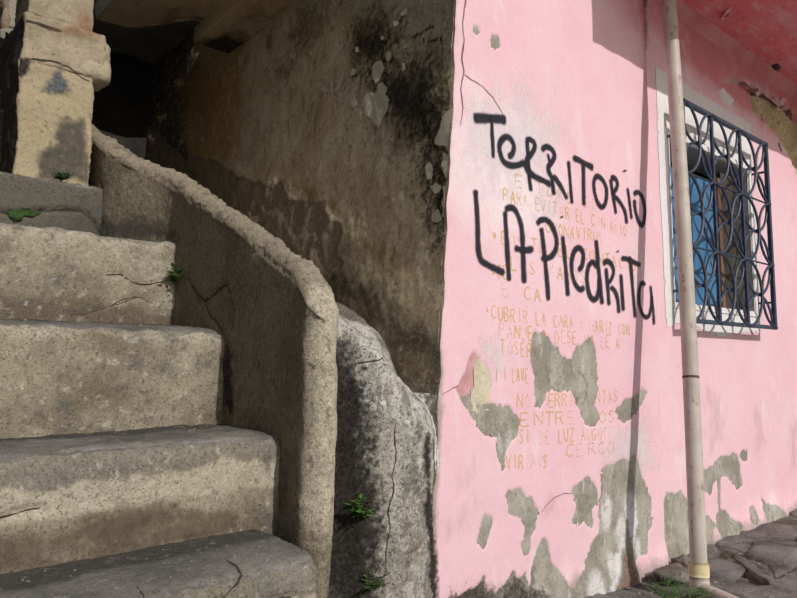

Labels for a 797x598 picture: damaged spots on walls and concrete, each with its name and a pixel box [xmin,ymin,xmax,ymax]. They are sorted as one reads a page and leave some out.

crack [461,0,503,121]
leakage [426,89,449,254]
leakage [99,215,175,239]
crack [73,274,169,315]
leakage [332,256,400,343]
leakage [223,345,234,414]
peeling [530,332,600,427]
crack [0,507,40,518]
crack [386,425,397,570]
peeling [454,454,654,598]
peeling [664,490,689,561]
peeling [703,449,787,545]